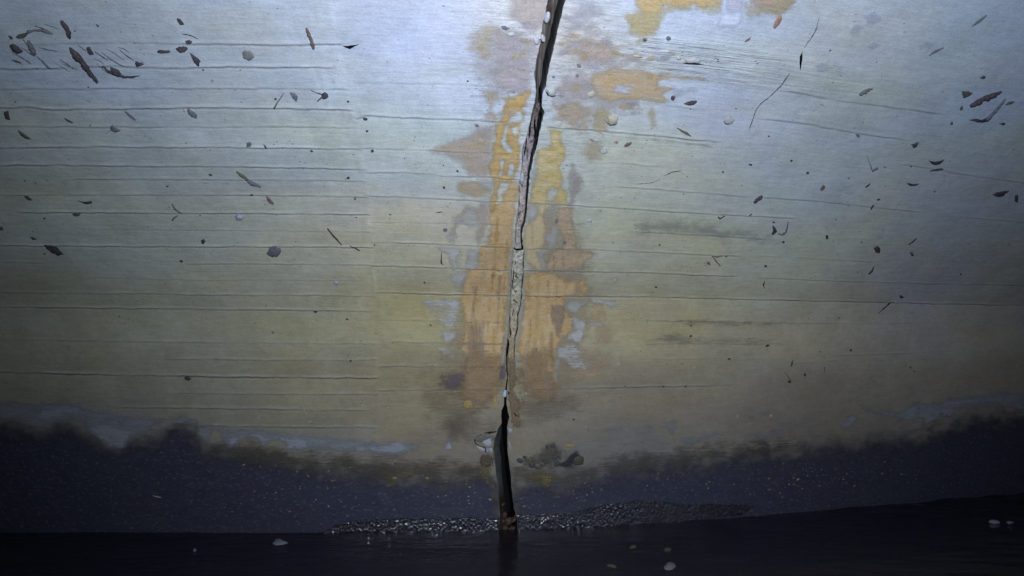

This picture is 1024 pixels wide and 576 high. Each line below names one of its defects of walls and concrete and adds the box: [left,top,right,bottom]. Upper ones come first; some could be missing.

rust [626,0,722,37]
rust [751,0,795,14]
crack [506,0,558,373]
rust [435,0,704,408]
leakage [0,401,500,533]
crack [493,411,517,531]
leakage [513,392,1024,530]